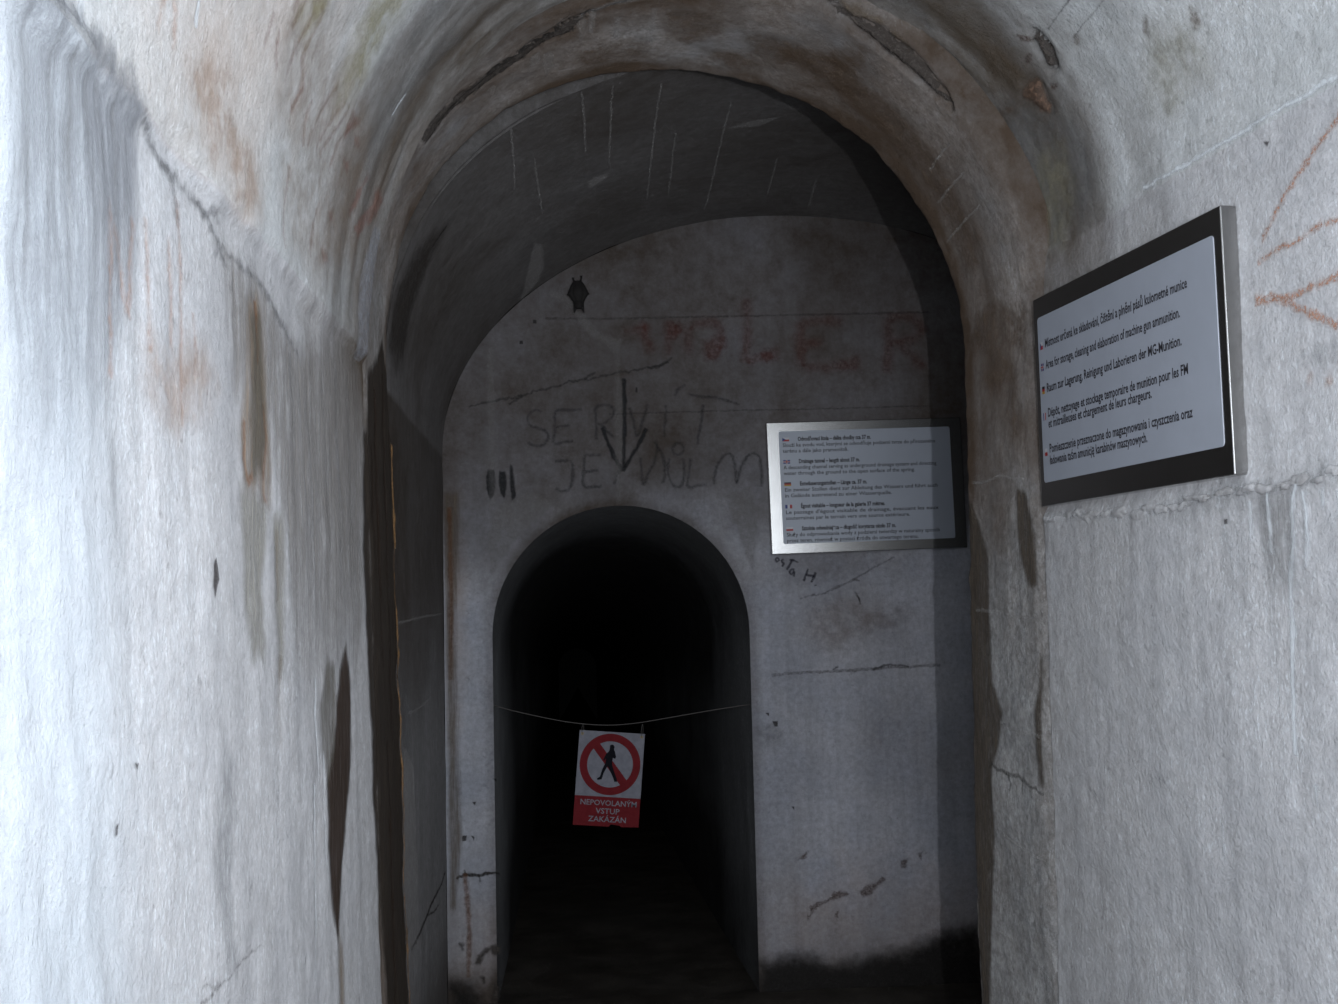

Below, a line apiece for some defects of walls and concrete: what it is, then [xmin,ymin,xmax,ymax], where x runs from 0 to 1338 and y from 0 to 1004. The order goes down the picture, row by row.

spalling [421,10,593,142]
water stain [1289,484,1309,755]